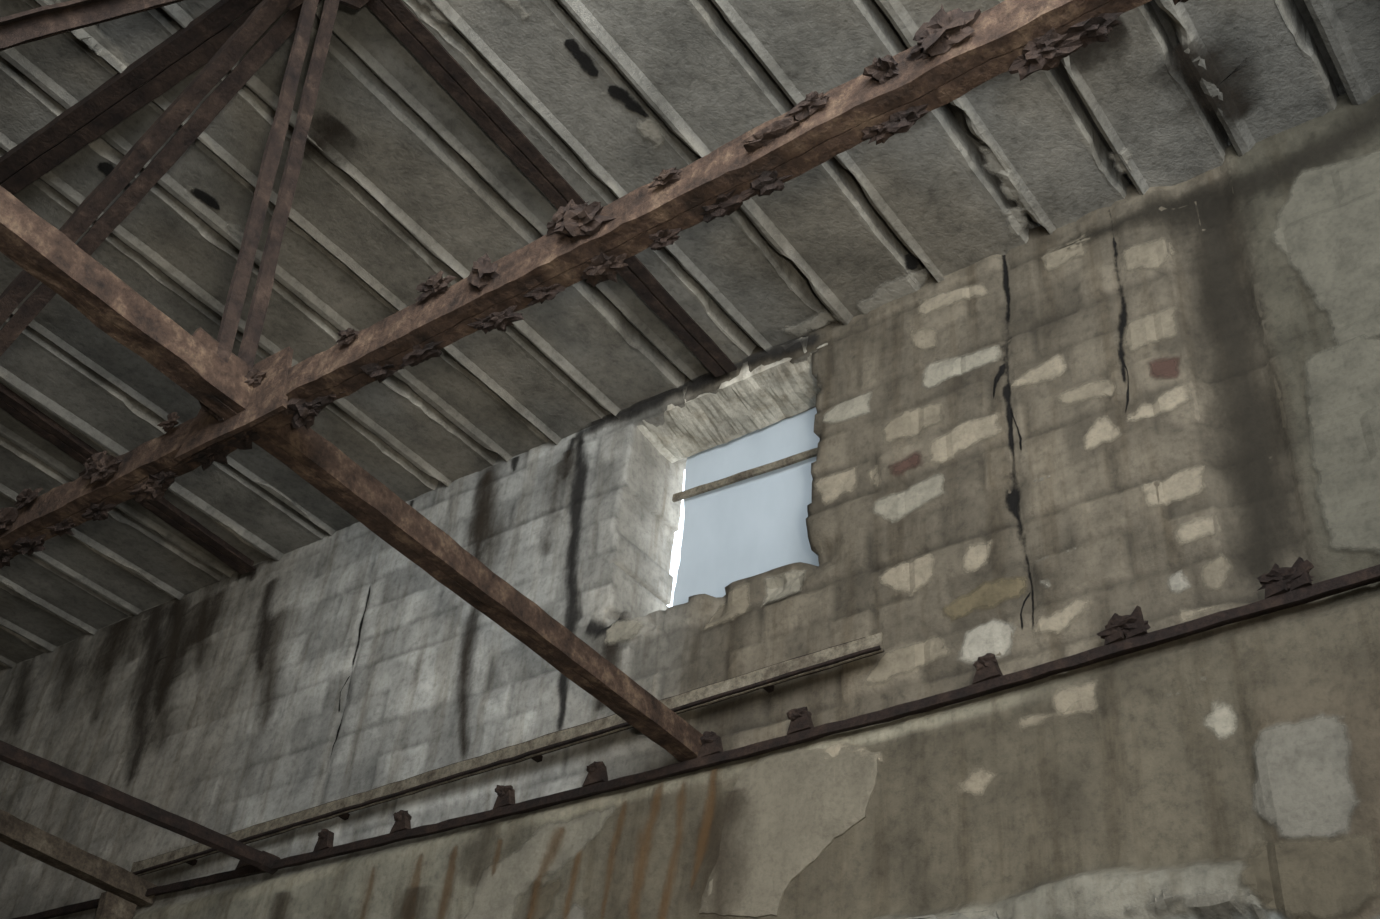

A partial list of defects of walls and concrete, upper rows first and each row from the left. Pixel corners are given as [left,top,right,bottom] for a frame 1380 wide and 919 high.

crack [1111,221,1129,412]
leakage [471,470,493,561]
leakage [552,332,820,665]
crack [993,255,1034,629]
leakage [102,593,221,781]
leakage [247,564,279,722]
leakage [457,608,478,756]
leakage [558,673,567,731]
peeling [699,743,881,918]